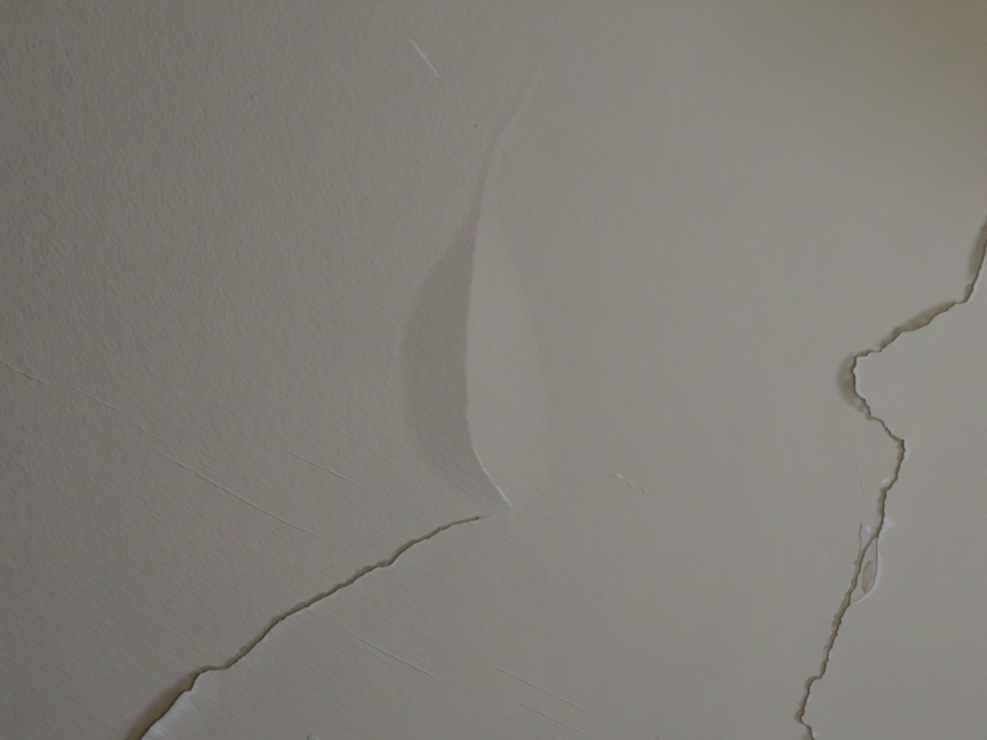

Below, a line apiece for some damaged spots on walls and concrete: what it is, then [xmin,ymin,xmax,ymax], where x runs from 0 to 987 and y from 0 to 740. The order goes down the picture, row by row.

crack [122,512,503,740]
crack [790,215,987,740]